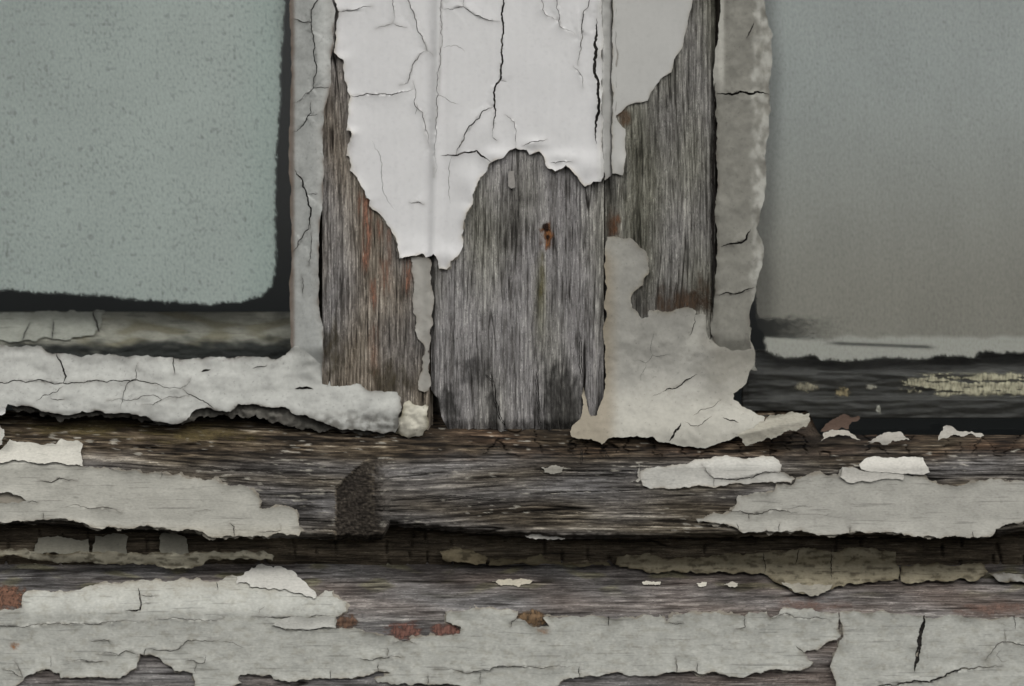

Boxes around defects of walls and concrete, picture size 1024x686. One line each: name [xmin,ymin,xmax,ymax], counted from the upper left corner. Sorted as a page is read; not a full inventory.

crack [292,0,565,184]
crack [544,0,601,144]
peeling [333,0,693,392]
rust [540,223,553,249]
crack [692,84,767,331]
crack [0,322,214,409]
peeling [570,236,1024,539]
rust [0,585,25,610]
rust [385,621,461,641]
peeling [0,406,1024,686]
rust [517,609,547,633]
crack [879,615,1024,686]